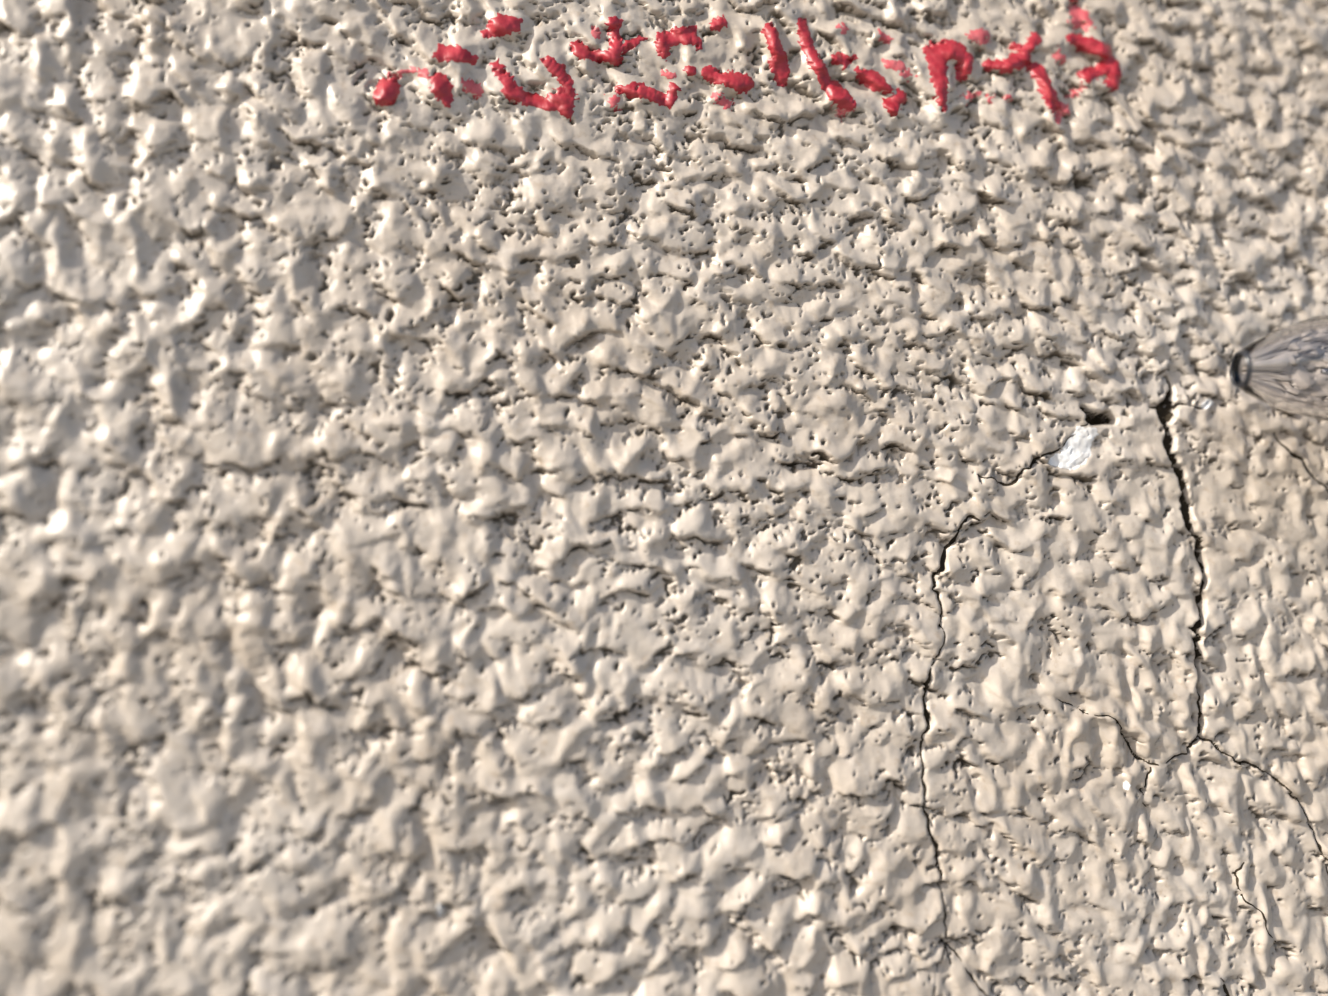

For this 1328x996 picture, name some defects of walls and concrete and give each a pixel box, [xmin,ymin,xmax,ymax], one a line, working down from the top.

crack [978,416,1089,486]
crack [1059,379,1328,874]
crack [919,515,987,996]
crack [1233,862,1276,944]
crack [1220,978,1230,996]